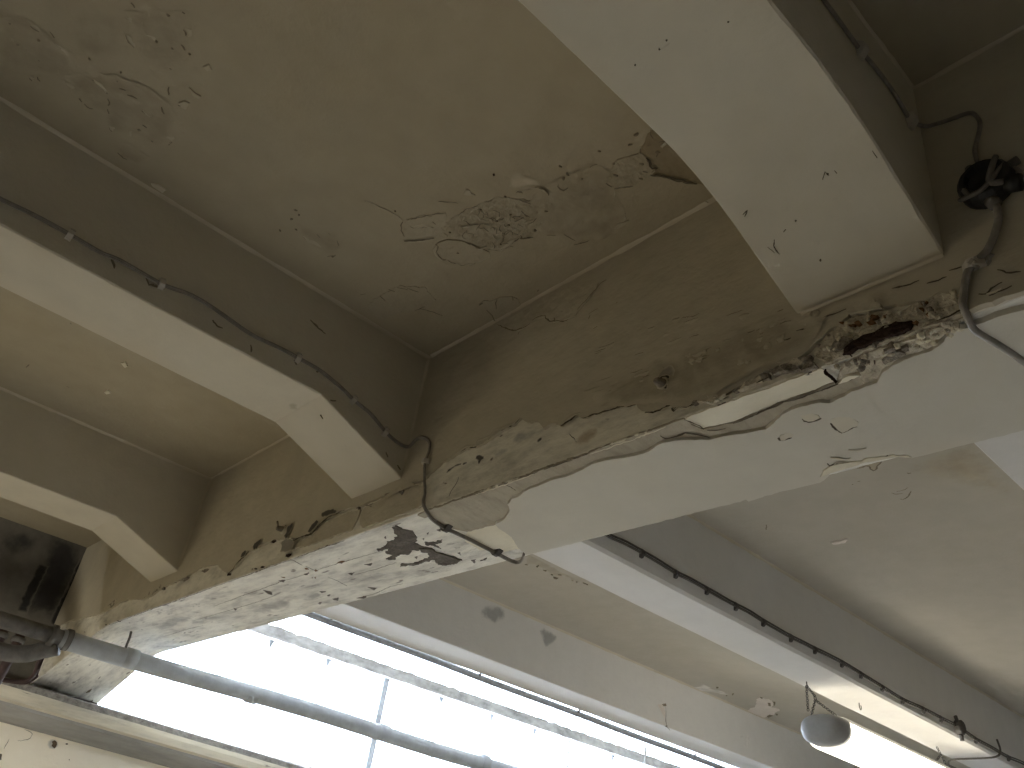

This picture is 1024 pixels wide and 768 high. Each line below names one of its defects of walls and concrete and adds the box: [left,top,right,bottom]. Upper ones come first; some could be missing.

peeling [606,130,704,201]
peeling [377,289,966,585]